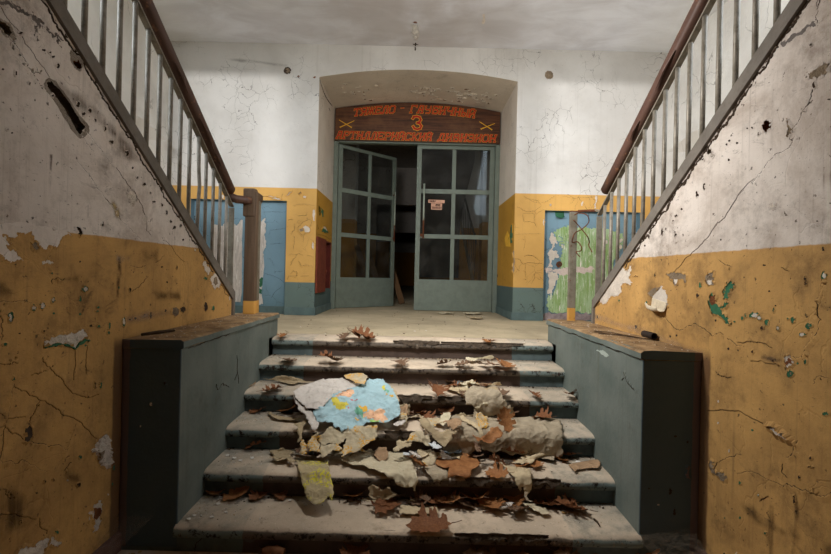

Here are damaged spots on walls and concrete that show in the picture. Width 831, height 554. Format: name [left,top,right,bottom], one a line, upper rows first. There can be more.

spalling [0,10,61,70]
spalling [70,49,84,71]
crack [790,0,824,27]
spalling [44,78,115,145]
crack [625,46,777,266]
crack [668,86,813,285]
peeling [0,219,84,265]
peeling [542,212,638,321]
peeling [41,311,152,350]
peeling [696,270,814,338]
crack [0,345,100,447]
peeling [15,528,64,554]